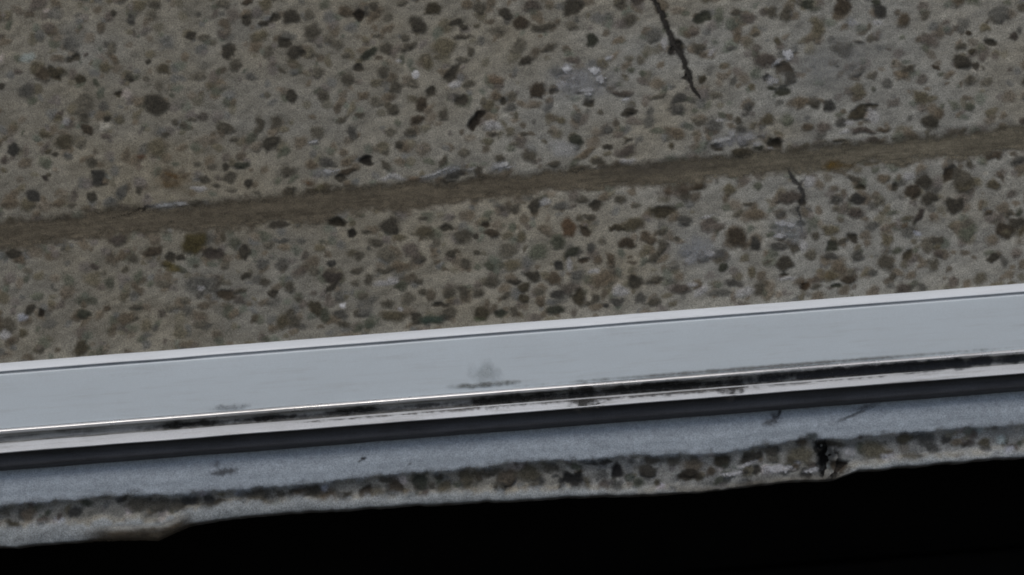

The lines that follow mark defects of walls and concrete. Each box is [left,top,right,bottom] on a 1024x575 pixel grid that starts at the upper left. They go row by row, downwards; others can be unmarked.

crack [651,0,700,98]
crack [788,168,805,232]
spalling [721,461,792,477]
spalling [805,442,855,478]